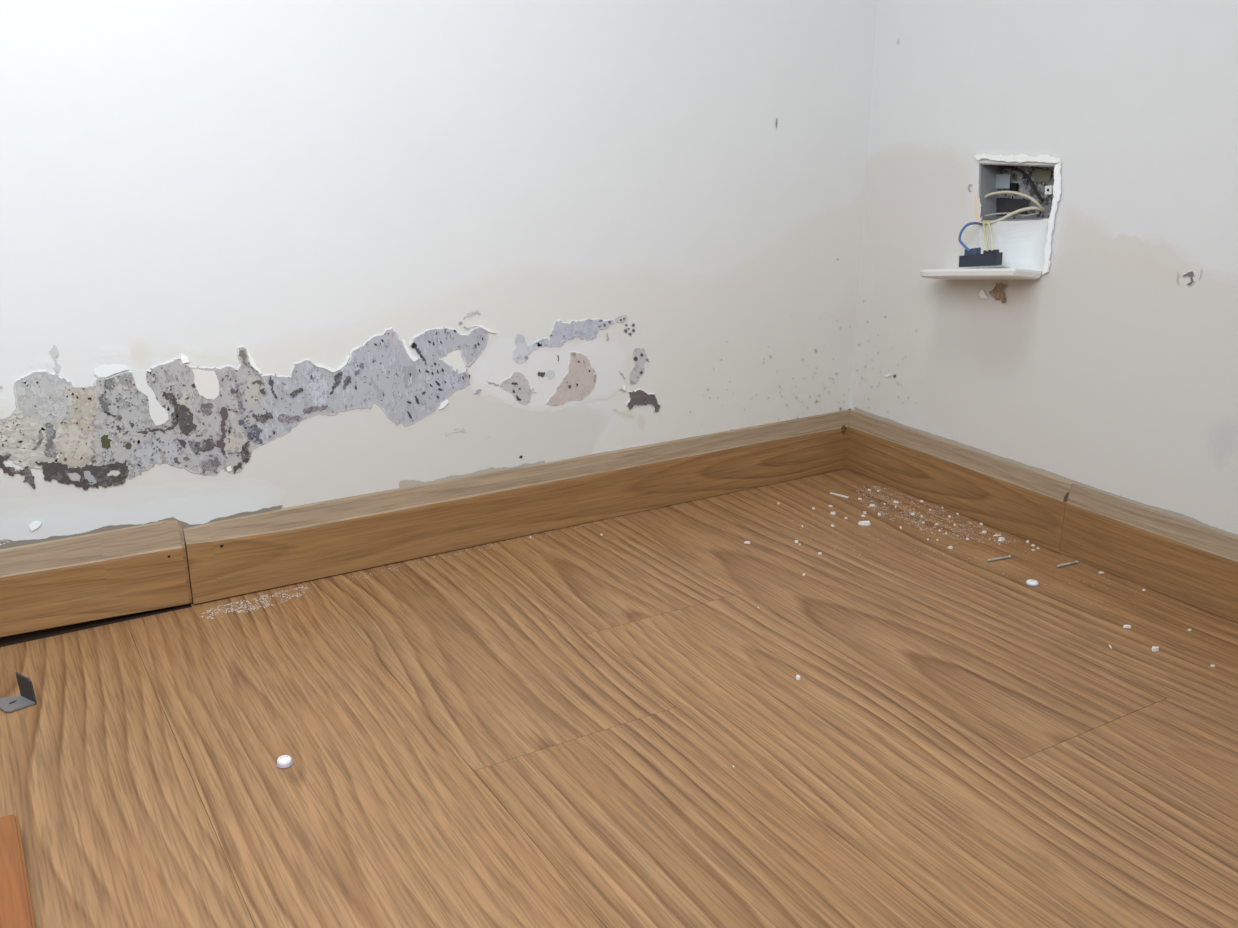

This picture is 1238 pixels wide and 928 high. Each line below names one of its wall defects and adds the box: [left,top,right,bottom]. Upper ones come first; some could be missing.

flaking render [974,153,1061,303]
peeling [0,315,661,479]